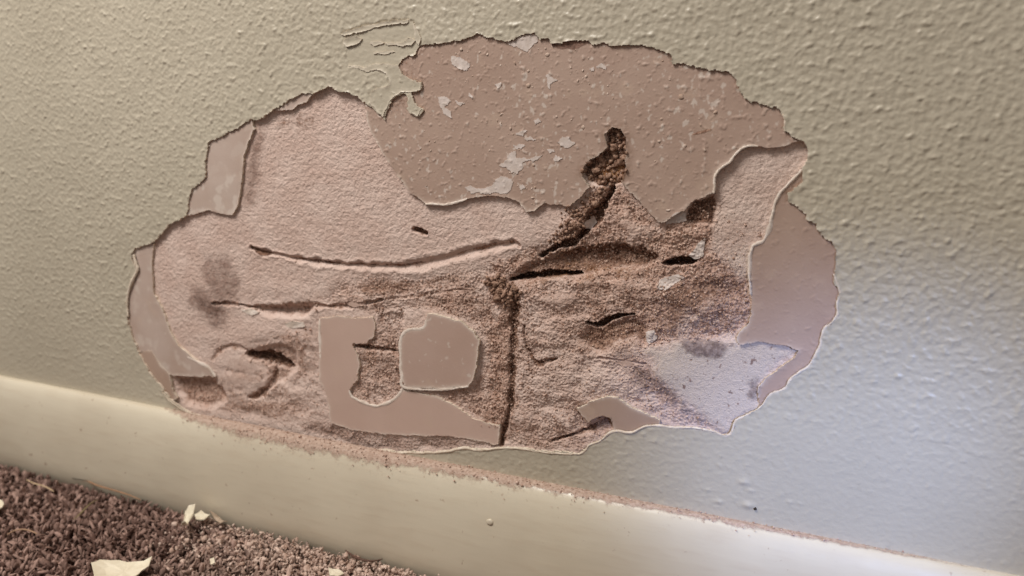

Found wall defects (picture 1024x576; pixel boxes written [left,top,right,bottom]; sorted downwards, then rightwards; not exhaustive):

crack [251,246,423,267]
crack [460,241,514,253]
spalling [153,20,841,455]
crack [541,186,616,257]
crack [500,292,558,445]
crack [552,417,612,441]